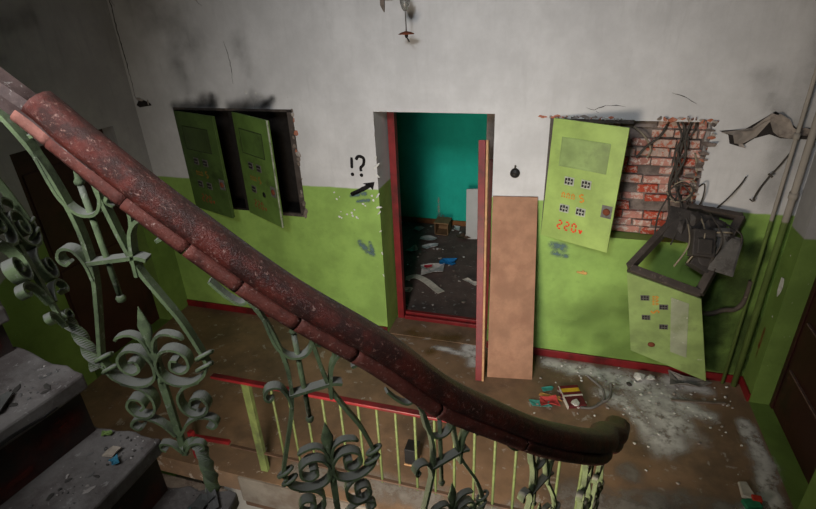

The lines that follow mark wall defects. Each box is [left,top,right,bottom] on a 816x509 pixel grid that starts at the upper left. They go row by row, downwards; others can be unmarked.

spalling [538,111,816,235]